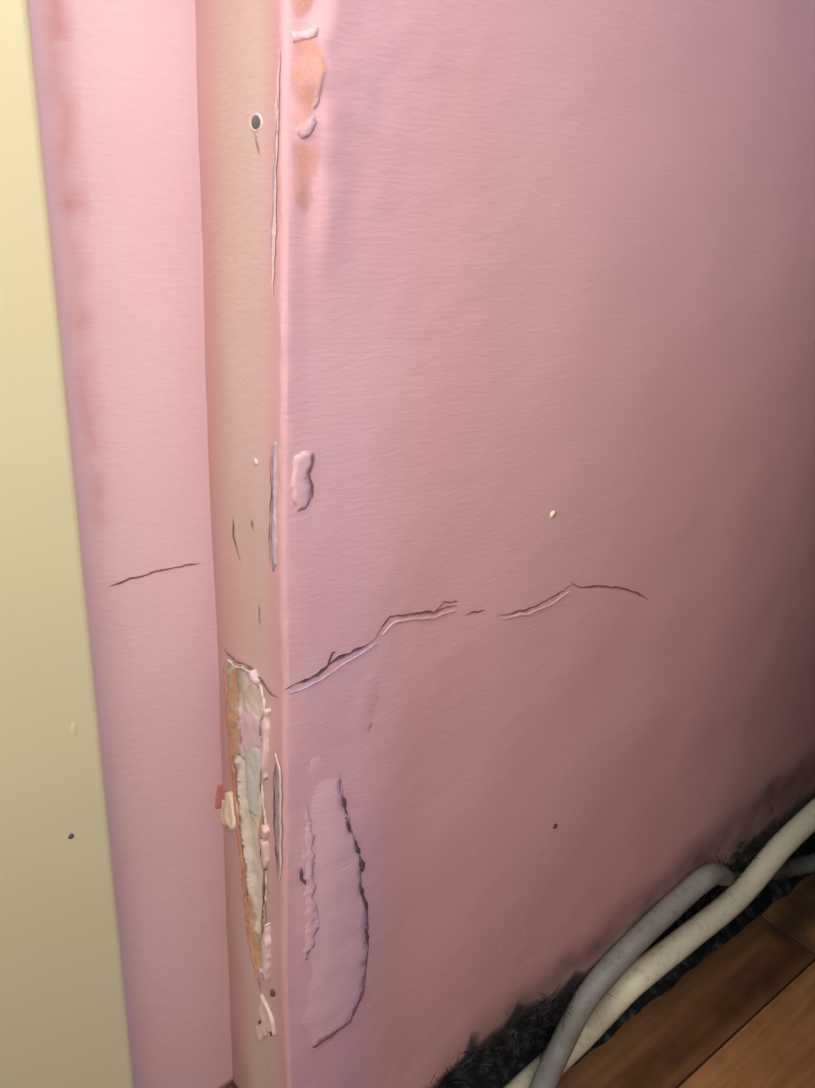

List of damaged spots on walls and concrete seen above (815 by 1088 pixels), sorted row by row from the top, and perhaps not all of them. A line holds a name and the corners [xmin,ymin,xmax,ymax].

spalling [253,441,277,571]
peeling [291,451,315,511]
crack [109,563,199,587]
crack [225,582,649,697]
spalling [215,659,282,1042]
peeling [300,755,369,1052]
leakage [730,780,815,871]
leakage [437,973,589,1088]